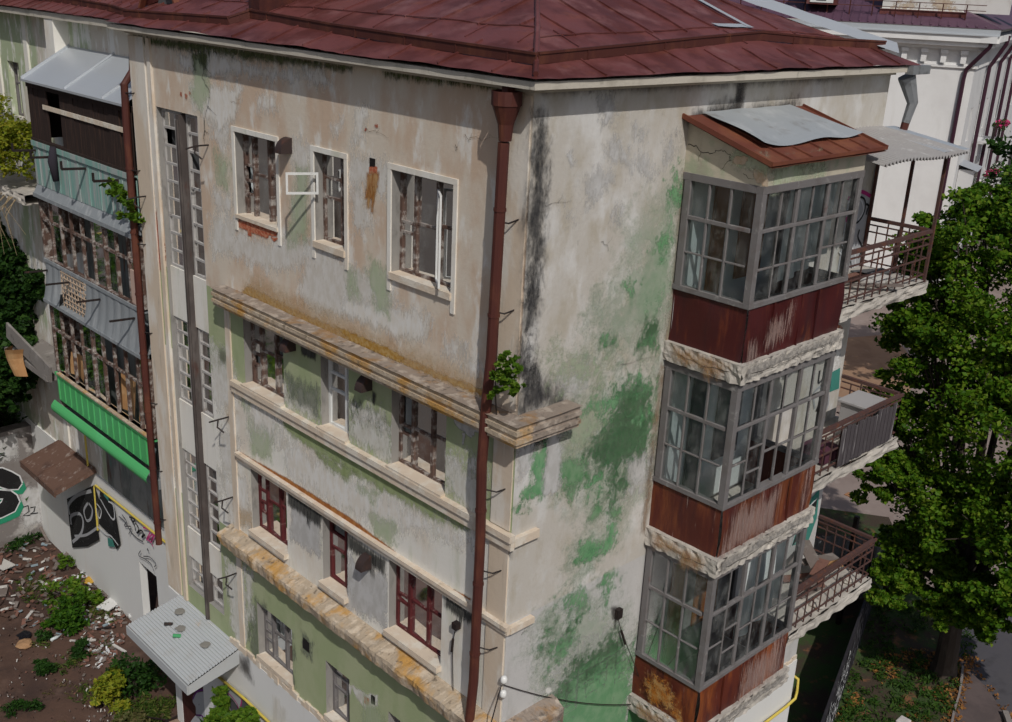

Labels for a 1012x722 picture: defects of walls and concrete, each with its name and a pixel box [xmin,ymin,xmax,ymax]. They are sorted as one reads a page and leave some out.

peeling [238,168,308,243]
corrosion [365,172,379,212]
spalling [369,158,377,174]
crack [688,144,754,179]
leakage [665,179,685,340]
leakage [520,286,538,379]
leakage [514,435,563,495]
leakage [628,375,663,531]
peeling [290,508,321,558]
peeling [224,557,254,644]
peeling [346,552,388,628]
corrosion [638,674,683,722]